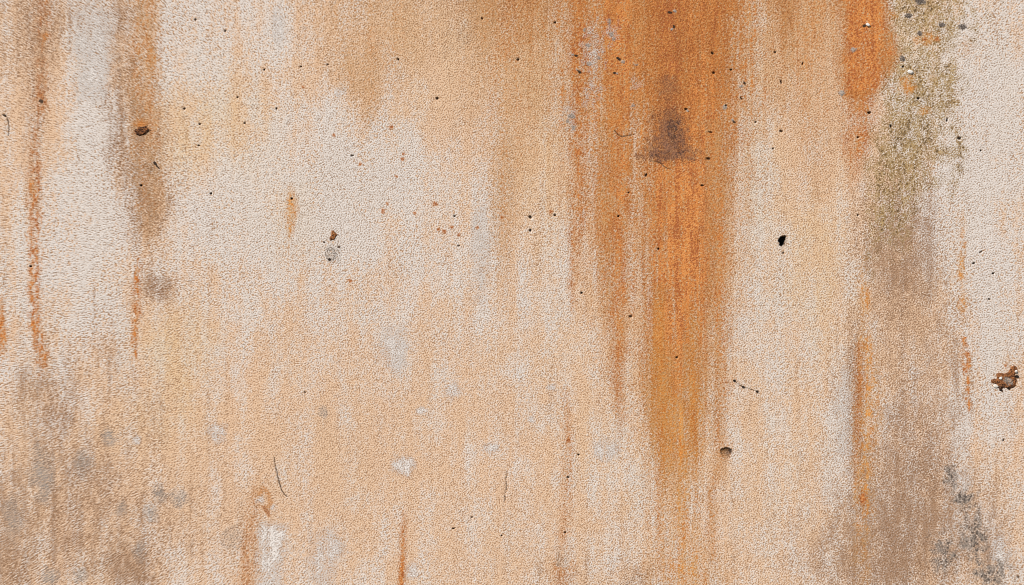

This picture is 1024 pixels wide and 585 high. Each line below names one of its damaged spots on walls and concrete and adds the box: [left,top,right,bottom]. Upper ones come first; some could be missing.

rust [31,0,50,114]
rust [133,121,149,136]
rust [839,0,898,169]
rust [29,135,47,365]
rust [542,0,770,585]
rust [991,364,1019,392]